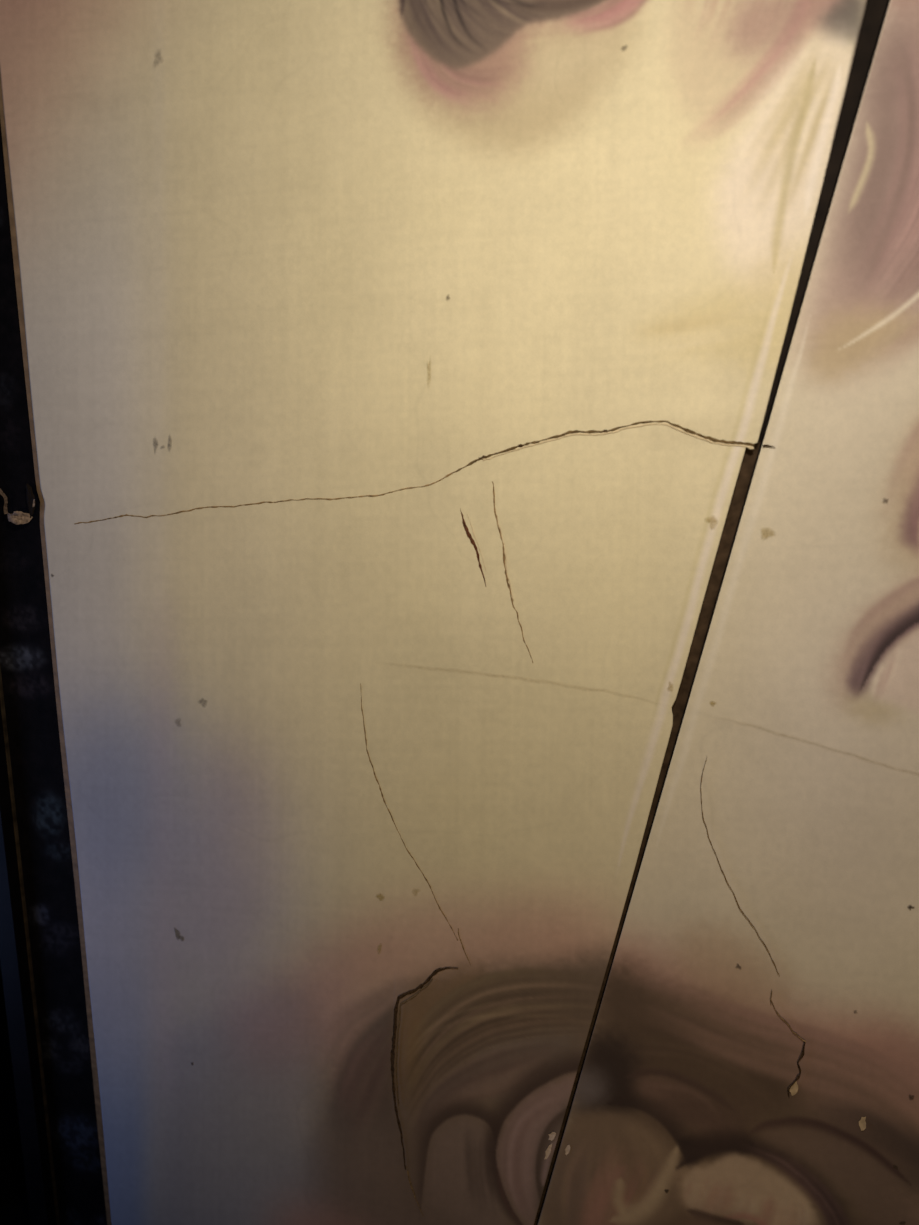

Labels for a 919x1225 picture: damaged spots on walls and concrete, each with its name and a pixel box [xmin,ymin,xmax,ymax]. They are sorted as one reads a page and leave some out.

crack [74,420,774,663]
crack [360,683,471,965]
crack [700,758,806,1096]
peeling [544,1132,570,1160]